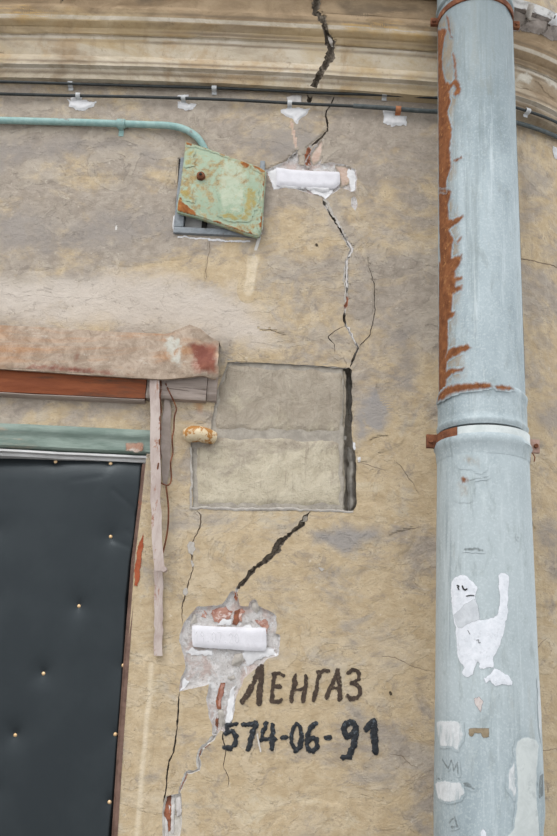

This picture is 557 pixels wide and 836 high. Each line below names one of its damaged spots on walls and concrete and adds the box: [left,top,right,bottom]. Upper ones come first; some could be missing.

crack [286,0,336,170]
spalling [265,139,358,211]
crack [322,198,376,367]
crack [181,512,202,624]
crack [234,512,310,605]
spalling [179,591,280,735]
crack [163,692,229,803]
spalling [162,793,182,836]